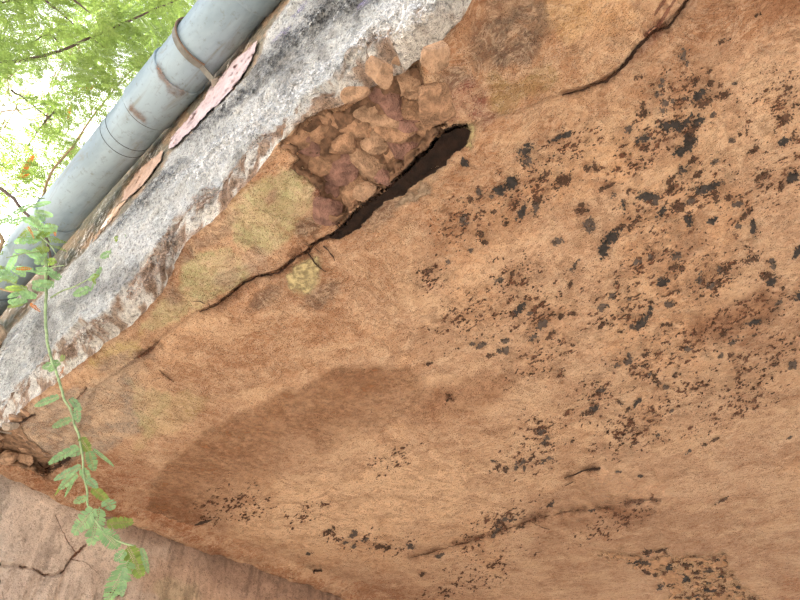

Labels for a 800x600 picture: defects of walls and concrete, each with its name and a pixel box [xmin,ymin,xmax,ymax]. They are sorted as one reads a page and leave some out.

crack [562,0,689,96]
flaking render [280,40,474,239]
crack [193,226,344,312]
damp [411,48,800,482]
flaking render [0,408,62,477]
damp [150,368,414,533]
damp [365,443,424,480]
crack [0,515,96,582]
damp [319,525,424,557]
damp [416,494,554,600]
damp [573,498,657,547]